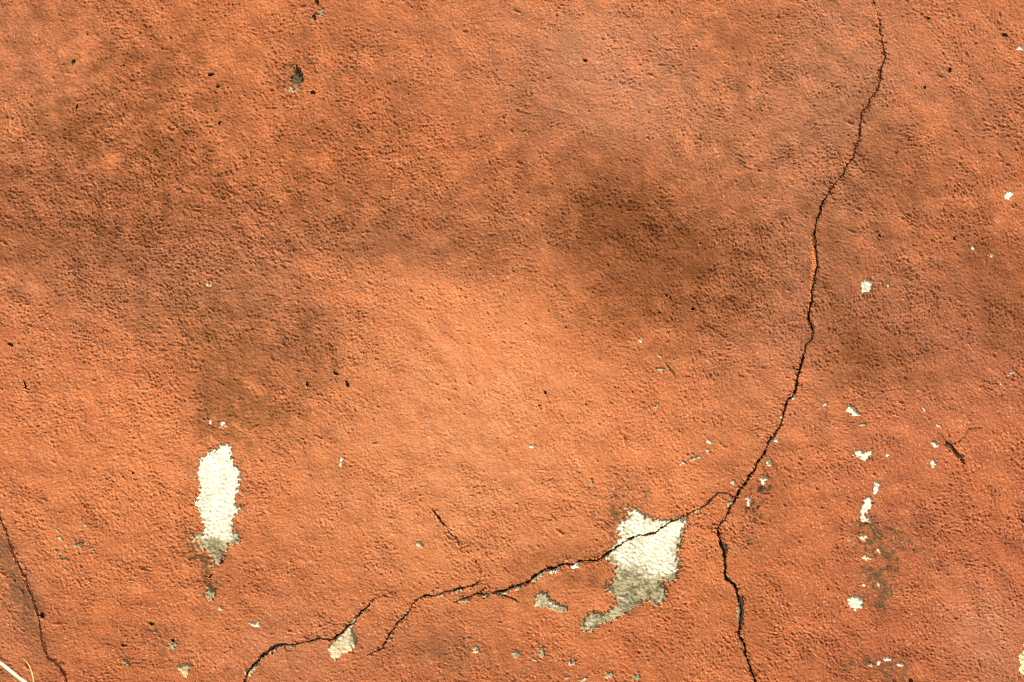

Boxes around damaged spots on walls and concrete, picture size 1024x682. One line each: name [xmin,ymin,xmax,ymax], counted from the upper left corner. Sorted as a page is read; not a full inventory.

crack [243,0,887,682]
crack [0,517,68,682]
flaking render [188,443,243,610]
flaking render [579,504,690,633]